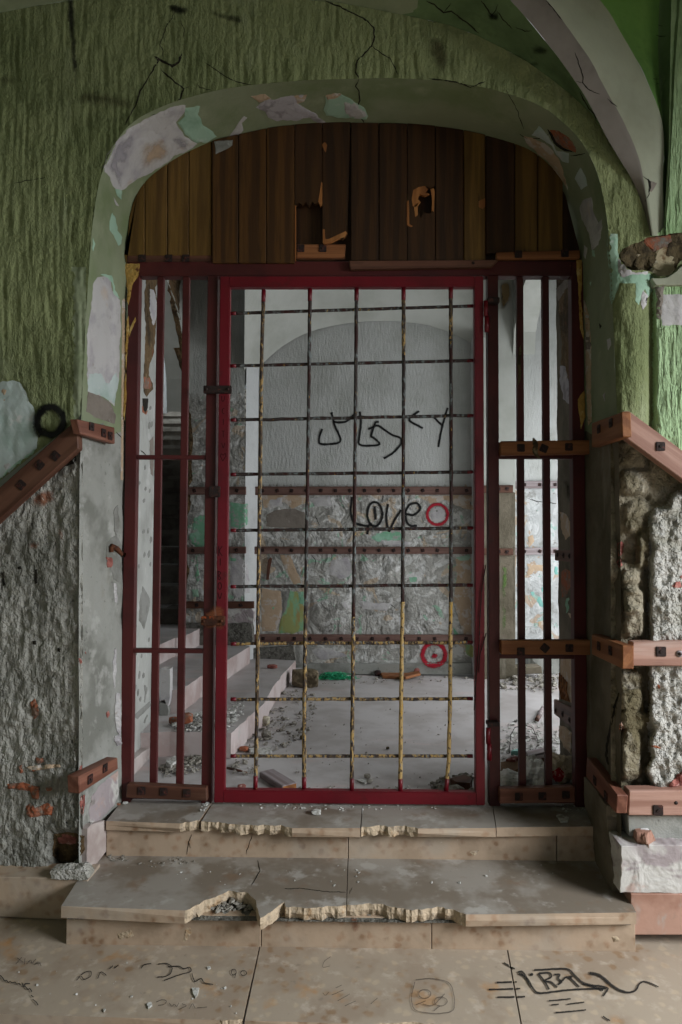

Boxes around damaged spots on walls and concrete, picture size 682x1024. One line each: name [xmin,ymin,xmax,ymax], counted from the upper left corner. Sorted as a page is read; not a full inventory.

crack [125,14,251,125]
peeling [251,93,368,123]
crack [326,1,398,122]
crack [427,1,529,33]
peeling [103,105,247,246]
flaking render [524,126,682,427]
peeling [0,380,38,479]
peeling [86,263,182,503]
flaking render [30,699,39,719]
flaking render [7,757,60,817]
flaking render [669,772,682,787]